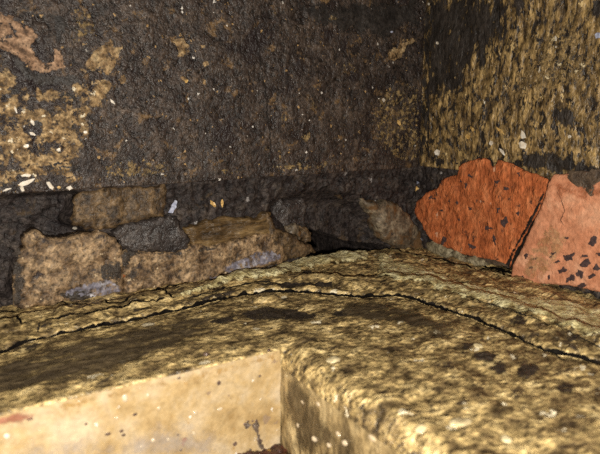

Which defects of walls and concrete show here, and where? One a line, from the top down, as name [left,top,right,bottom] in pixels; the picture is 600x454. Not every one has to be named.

crack [0,279,600,365]